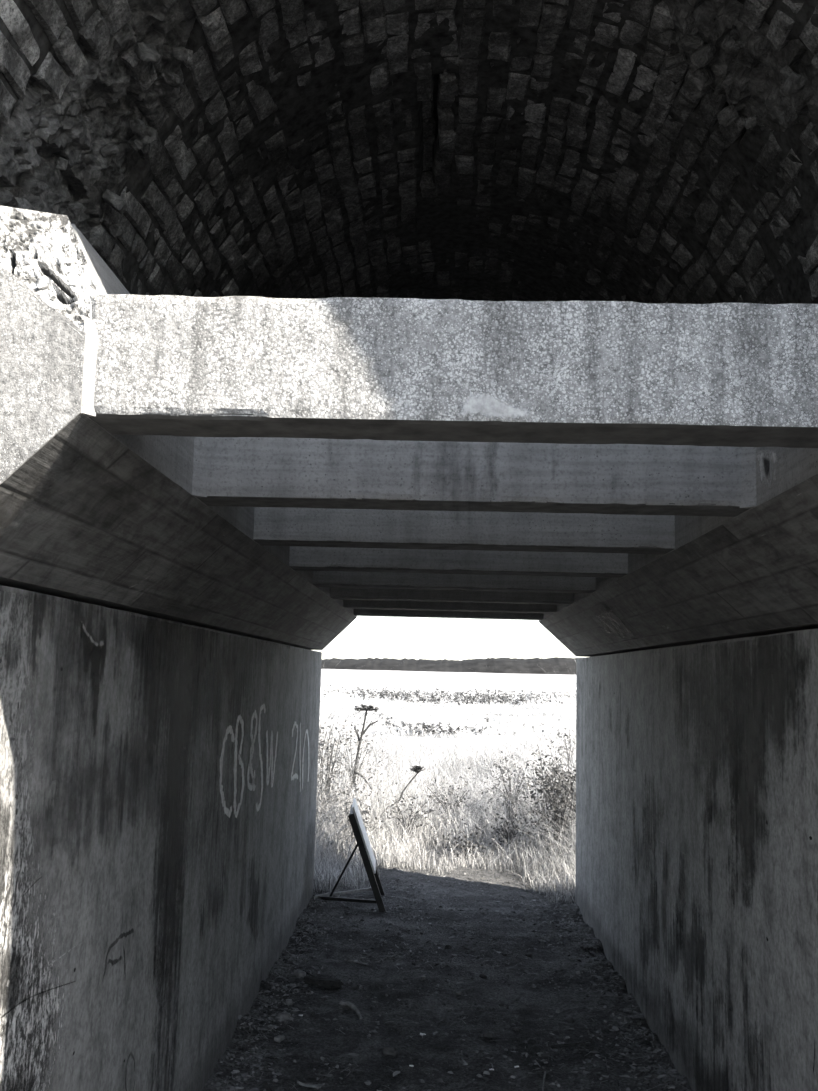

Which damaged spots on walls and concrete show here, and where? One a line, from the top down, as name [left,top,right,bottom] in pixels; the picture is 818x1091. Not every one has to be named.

spalling [0,0,196,337]
damp [17,591,290,1091]
damp [613,780,771,1091]
damp [673,633,811,904]